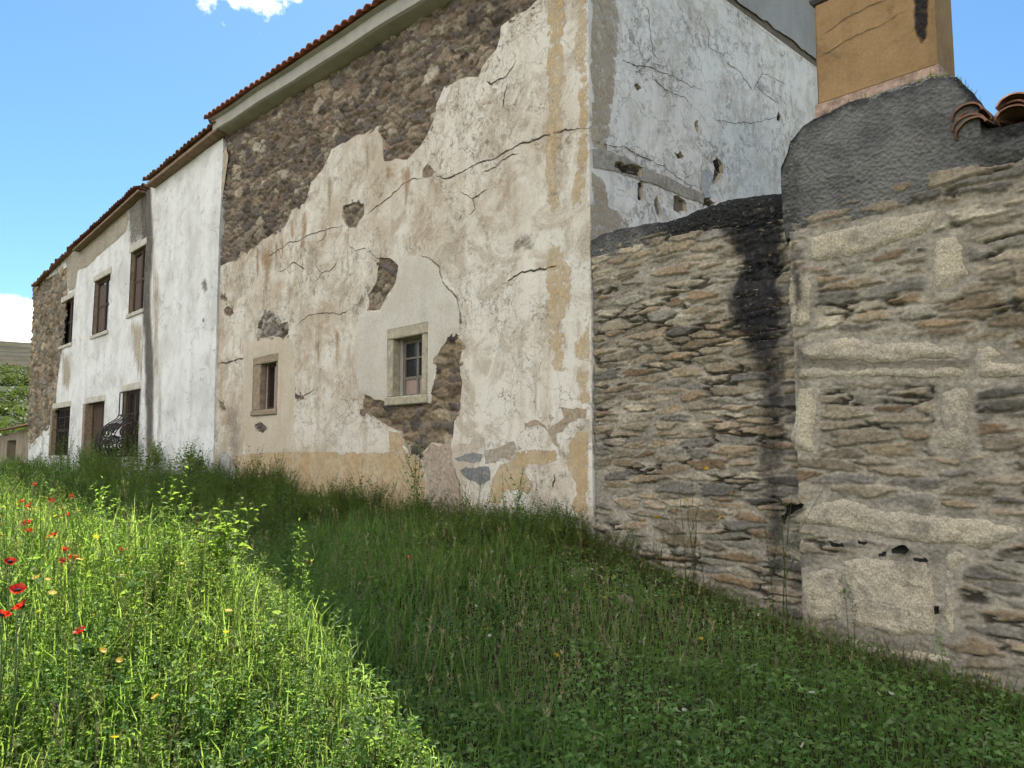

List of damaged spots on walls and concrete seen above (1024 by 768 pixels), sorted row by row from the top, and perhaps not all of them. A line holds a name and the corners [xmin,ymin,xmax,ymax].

crack [822,0,908,55]
water stain [914,0,928,41]
flaking render [220,0,724,267]
crack [370,128,699,215]
crack [267,225,380,281]
crack [422,256,461,324]
crack [504,266,556,284]
water stain [719,211,800,466]
peeling [218,247,590,518]
peeling [781,503,804,525]
peeling [879,545,928,562]